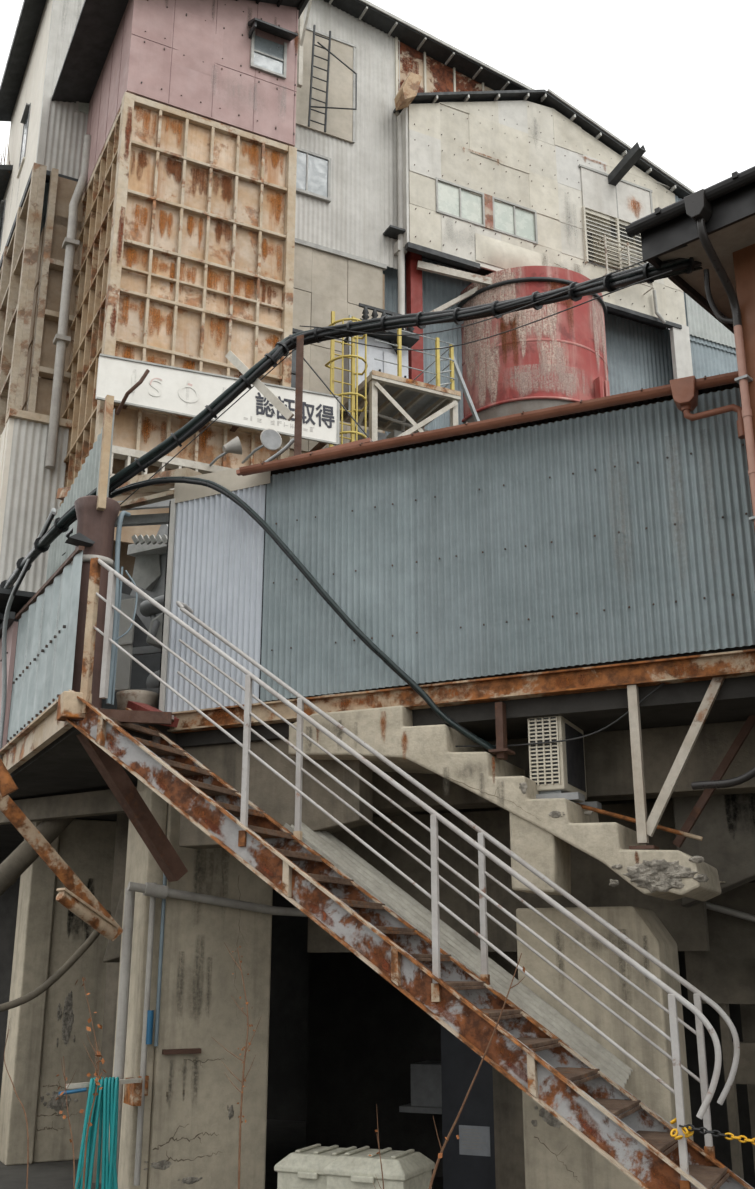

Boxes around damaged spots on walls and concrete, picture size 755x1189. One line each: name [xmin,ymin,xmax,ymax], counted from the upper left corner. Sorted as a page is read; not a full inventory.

corrosion [400,58,419,87]
corrosion [124,107,183,179]
corrosion [165,158,232,203]
corrosion [242,143,283,174]
corrosion [117,204,277,310]
corrosion [110,297,173,359]
corrosion [500,312,521,360]
spalling [609,856,709,893]
crack [153,1124,223,1162]